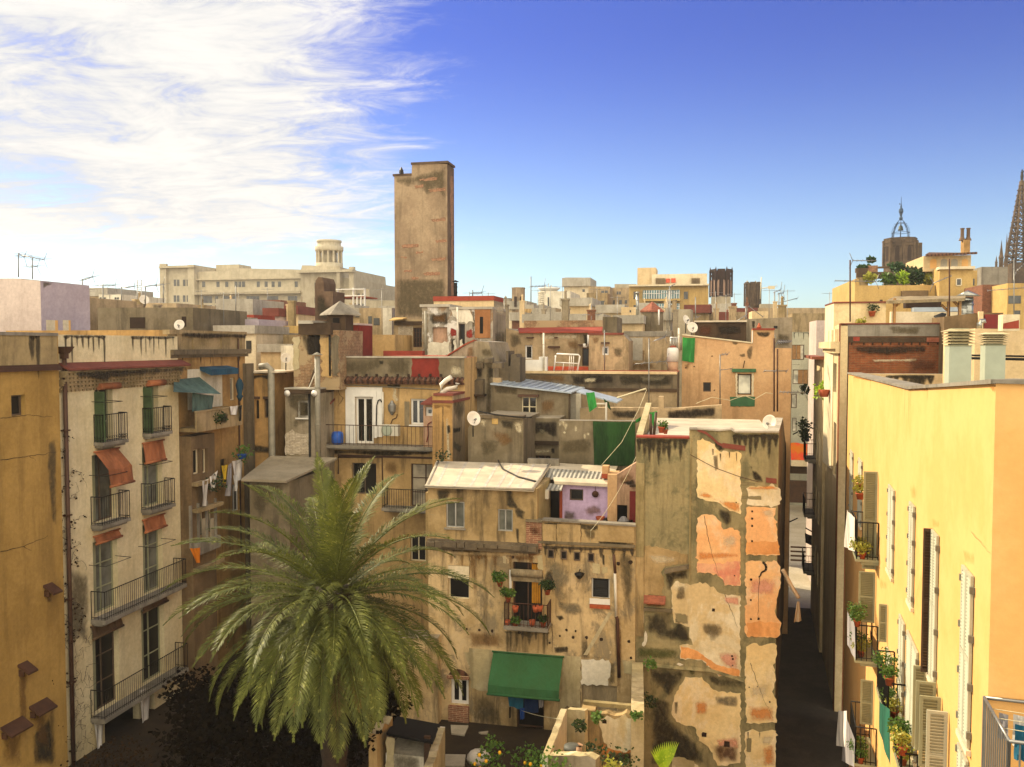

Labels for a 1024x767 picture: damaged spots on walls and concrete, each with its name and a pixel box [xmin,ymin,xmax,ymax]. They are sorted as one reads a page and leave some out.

leakage [64,335,105,363]
leakage [131,336,175,353]
leakage [637,439,688,463]
crack [704,516,767,626]
flaking render [644,438,782,767]